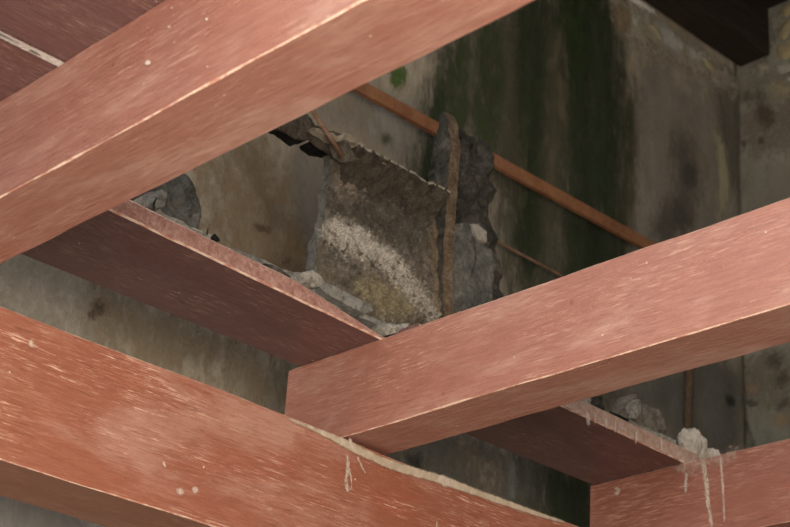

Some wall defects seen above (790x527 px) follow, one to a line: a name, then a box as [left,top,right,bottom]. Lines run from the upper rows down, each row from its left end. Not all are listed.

leakage [713,72,739,221]
peeling [470,224,487,244]
leakage [614,363,742,490]
leakage [393,433,553,512]
leakage [702,461,713,525]